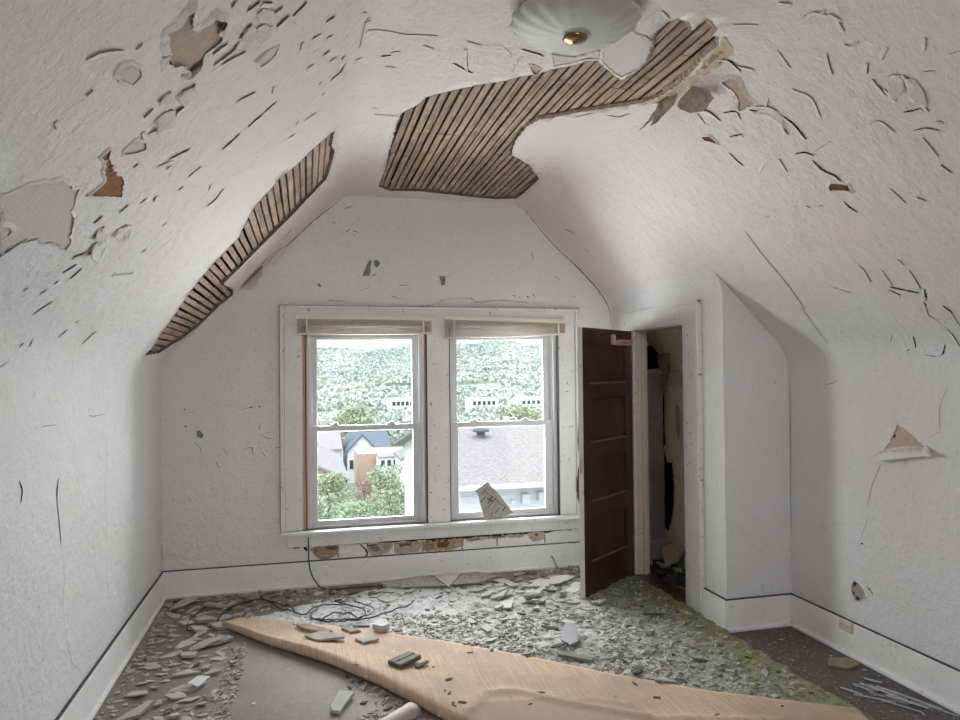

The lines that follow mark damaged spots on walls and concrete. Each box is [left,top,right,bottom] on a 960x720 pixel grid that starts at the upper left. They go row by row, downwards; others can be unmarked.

peeling [159,0,230,82]
crack [223,86,277,150]
crack [213,1,308,67]
crack [289,12,439,139]
flaking render [379,19,758,199]
peeling [0,137,149,256]
crack [63,85,224,279]
flaking render [146,132,335,355]
crack [744,231,828,344]
crack [56,478,64,568]
spalling [310,545,339,559]
spalling [366,531,545,556]